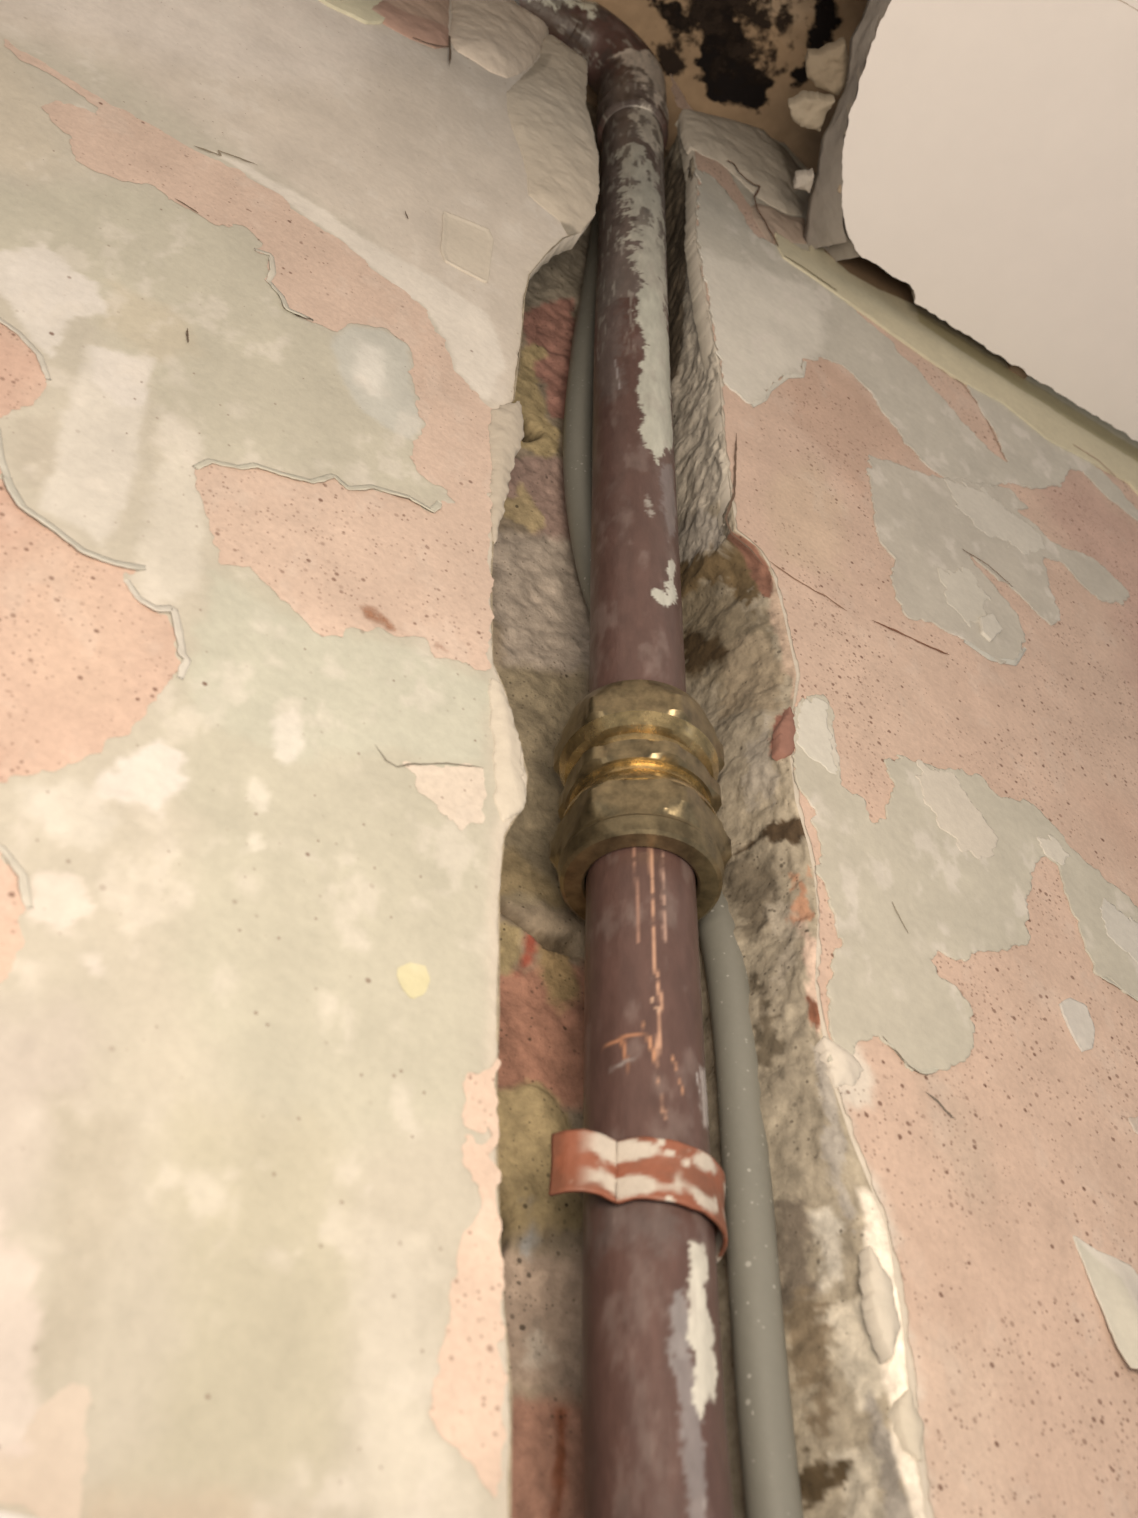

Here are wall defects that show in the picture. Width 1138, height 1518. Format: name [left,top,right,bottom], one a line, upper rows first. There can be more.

flaking render [372,0,450,49]
mould [652,0,842,113]
peeling [695,151,775,244]
peeling [0,39,526,830]
peeling [857,311,1007,462]
peeling [720,357,1138,907]
peeling [0,844,33,982]
peeling [397,962,430,999]
peeling [799,790,1138,1518]
peeling [429,1058,508,1498]